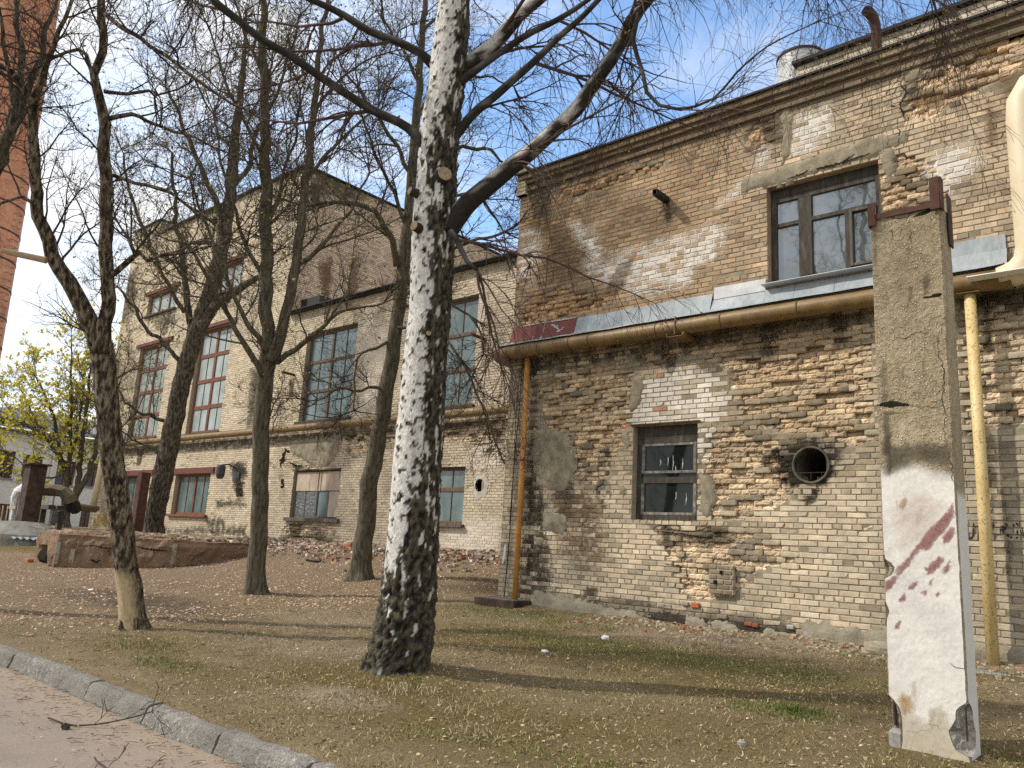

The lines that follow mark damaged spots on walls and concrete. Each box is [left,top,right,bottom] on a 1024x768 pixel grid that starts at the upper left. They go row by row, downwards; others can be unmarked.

spalling [905,37,1024,121]
spalling [736,114,783,155]
spalling [880,155,949,217]
leakage [517,188,550,285]
leakage [568,218,730,300]
crack [890,328,957,491]
leakage [518,346,625,594]
spalling [531,322,910,635]
leakage [799,488,819,506]
spalling [950,703,976,757]